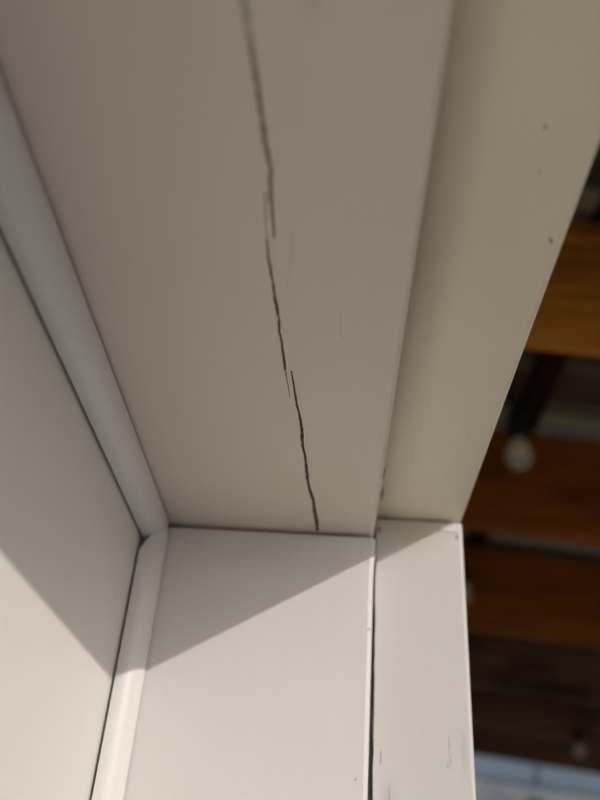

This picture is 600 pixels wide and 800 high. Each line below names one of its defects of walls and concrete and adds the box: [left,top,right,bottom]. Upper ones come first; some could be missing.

crack [239,0,320,531]